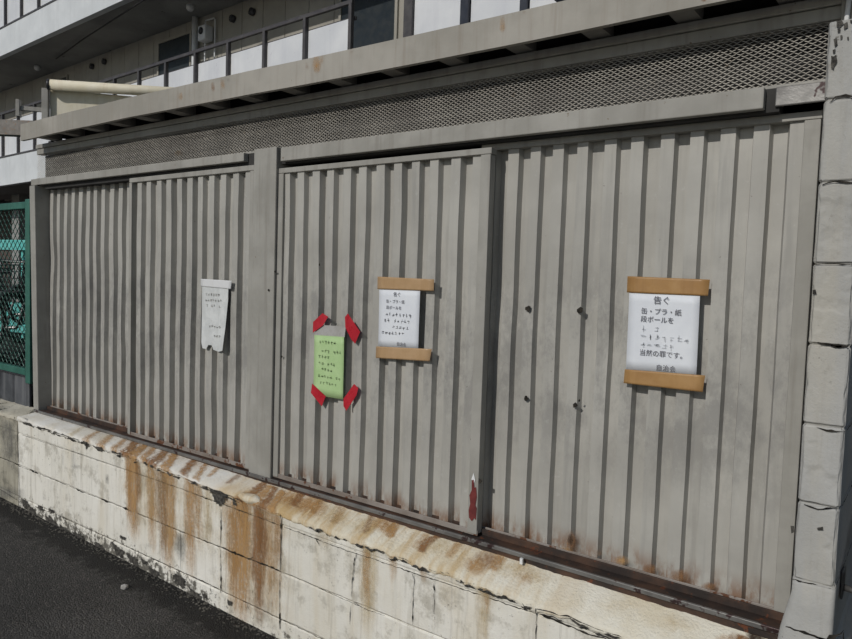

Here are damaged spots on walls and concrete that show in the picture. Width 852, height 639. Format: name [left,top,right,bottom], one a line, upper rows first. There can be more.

peeling [831,20,852,69]
crack [822,178,852,186]
corrosion [98,435,217,557]
corrosion [228,482,321,607]
corrosion [419,535,439,552]
crack [786,626,844,639]